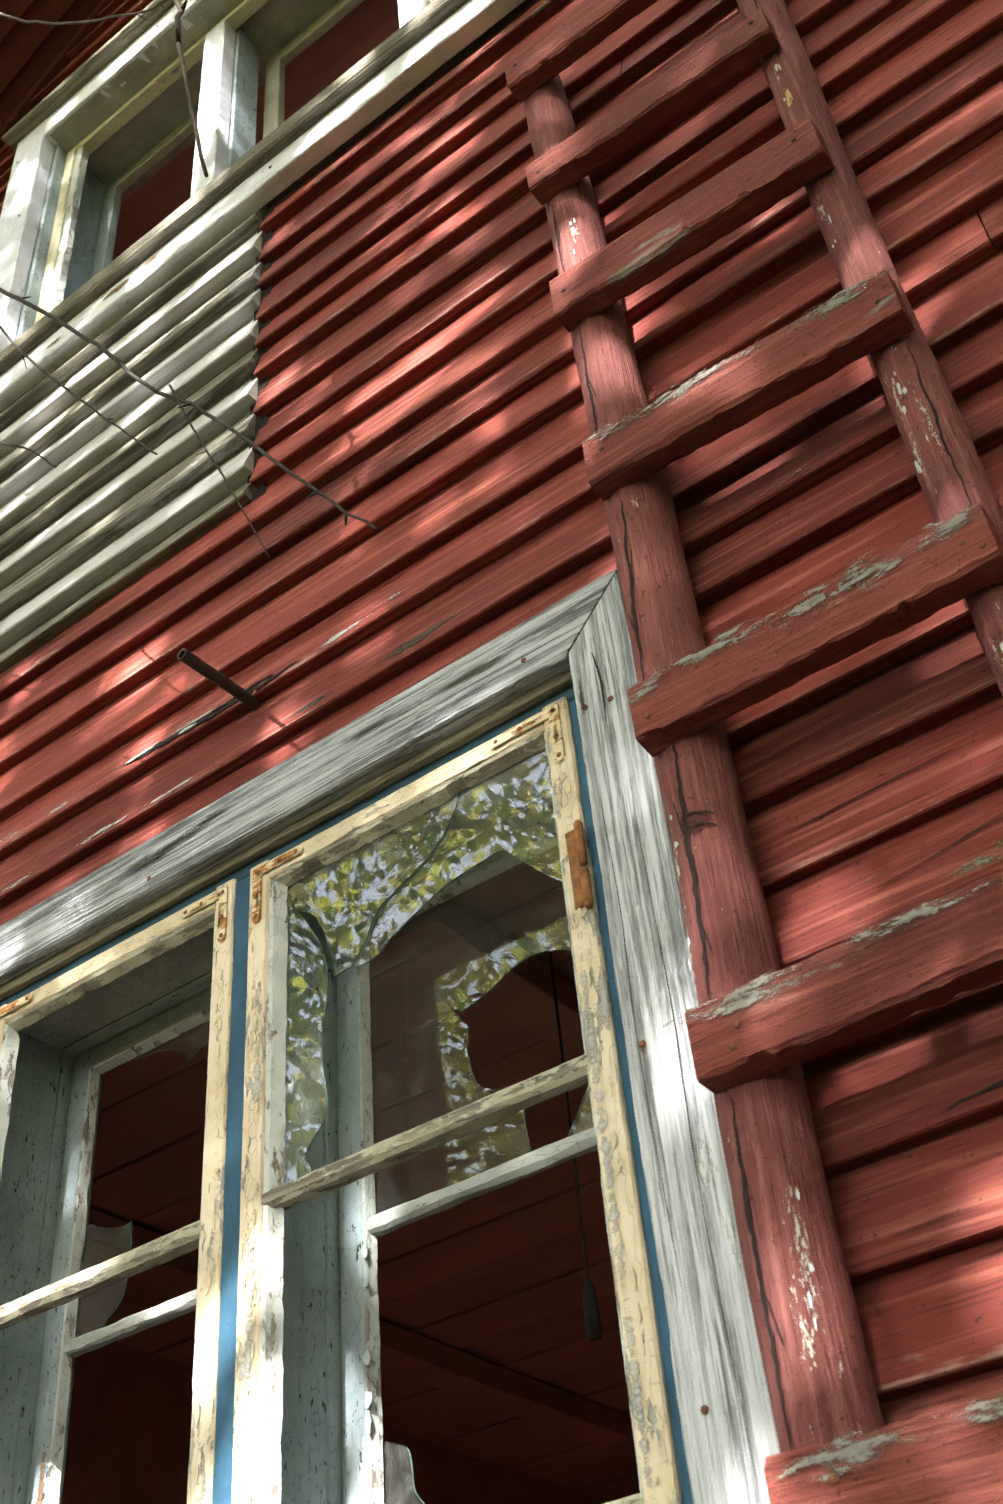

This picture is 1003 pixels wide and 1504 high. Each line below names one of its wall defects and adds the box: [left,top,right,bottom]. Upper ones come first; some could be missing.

peeling [240,1187,258,1395]
peeling [571,883,670,1504]
crack [730,1095,791,1449]
peeling [781,1184,826,1371]
peeling [35,1444,46,1504]